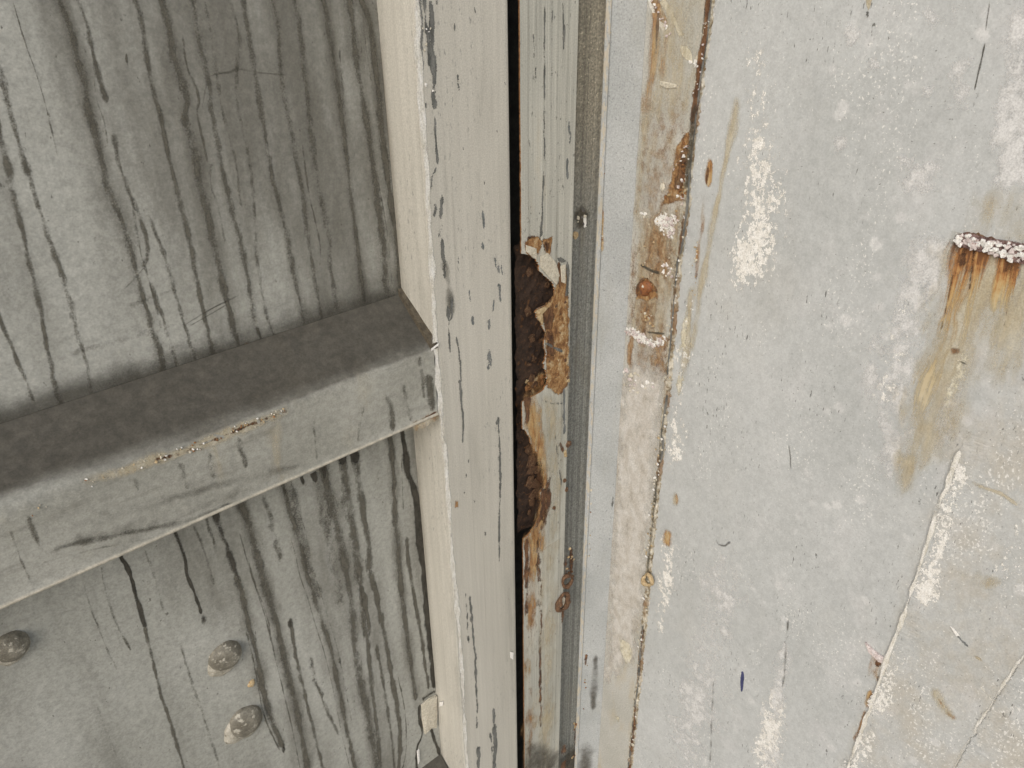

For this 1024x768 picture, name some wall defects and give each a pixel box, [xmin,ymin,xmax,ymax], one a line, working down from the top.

corrosion [627,5,738,370]
peeling [525,444,544,515]
corrosion [523,213,577,768]
peeling [545,388,572,457]
corrosion [898,233,1024,487]